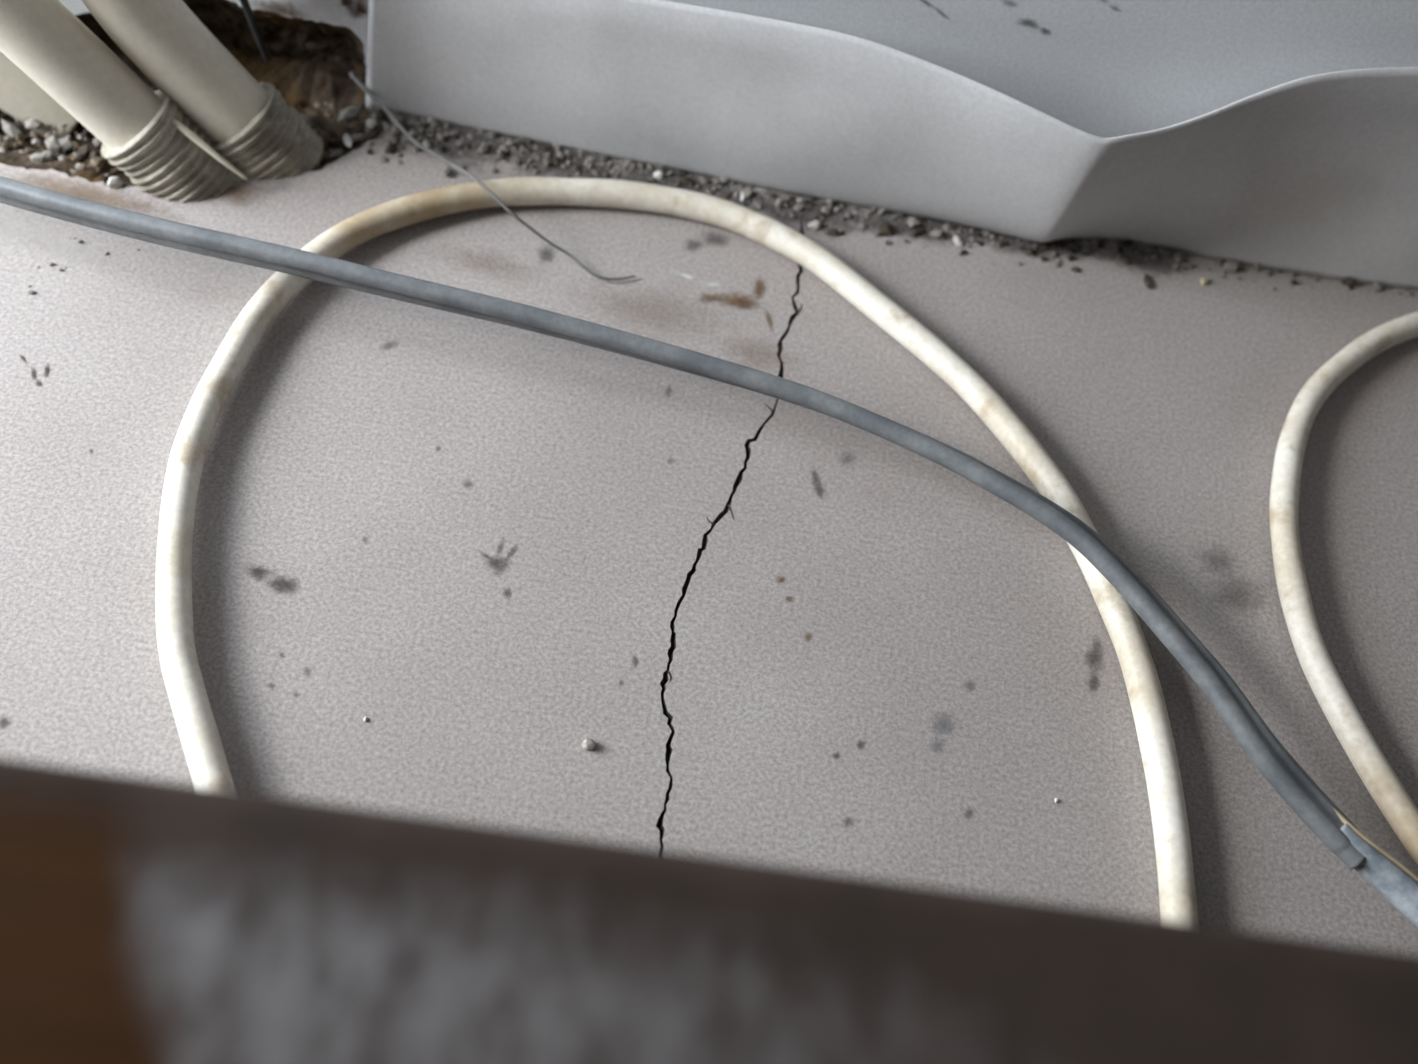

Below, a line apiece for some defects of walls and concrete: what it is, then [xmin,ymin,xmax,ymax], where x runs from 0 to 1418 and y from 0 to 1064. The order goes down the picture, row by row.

spalling [0,109,137,189]
spalling [75,12,159,91]
spalling [182,0,390,171]
crack [656,221,805,850]